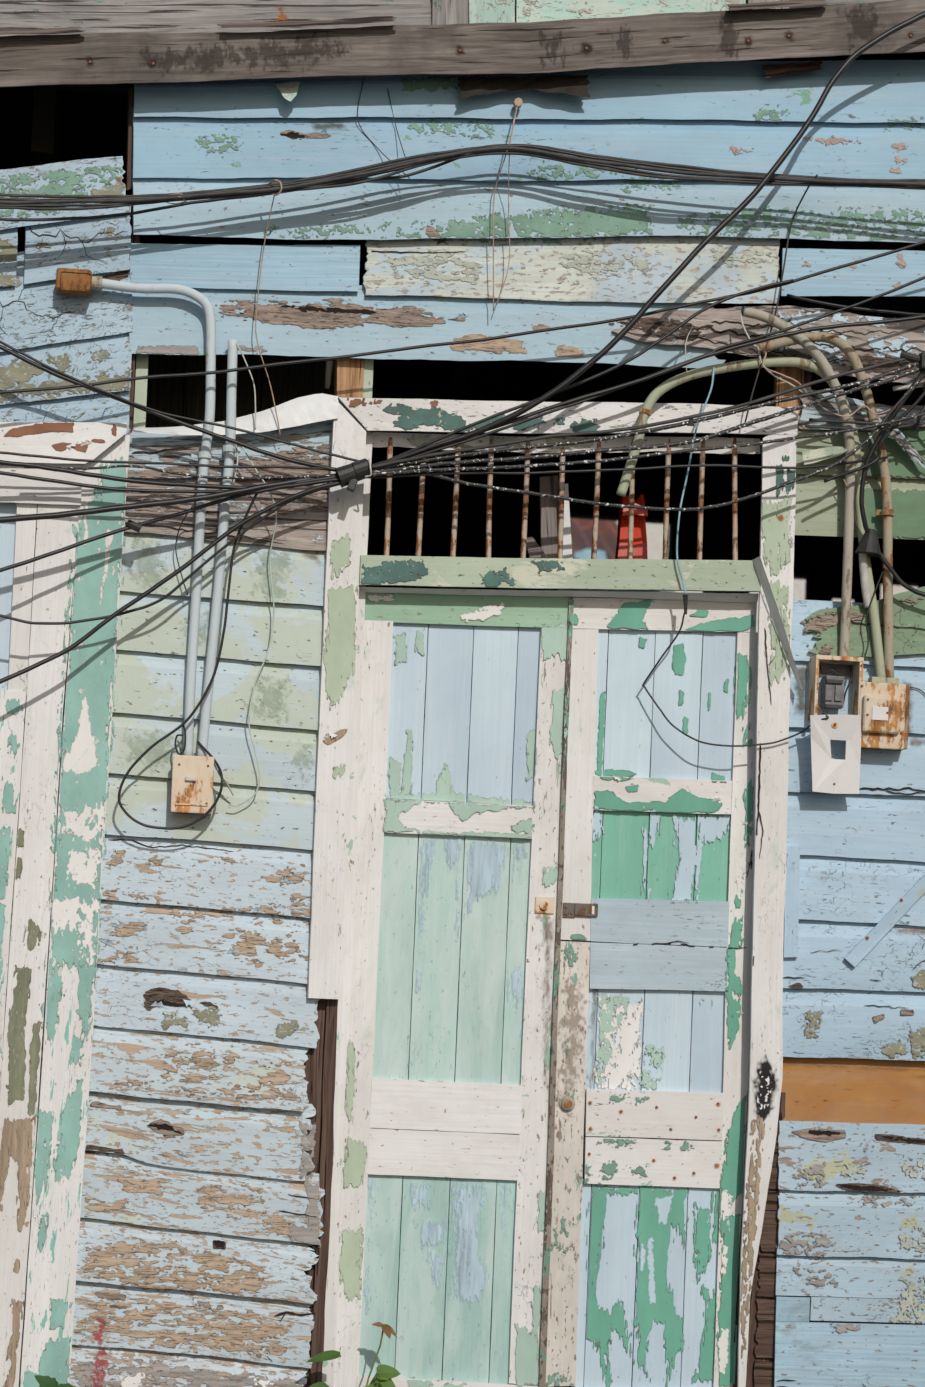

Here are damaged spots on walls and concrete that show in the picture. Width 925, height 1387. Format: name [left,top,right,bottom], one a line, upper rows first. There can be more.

peeling [0,163,125,289]
peeling [677,206,925,288]
peeling [136,345,199,355]
spalling [281,305,376,314]
peeling [4,422,117,452]
peeling [321,532,429,710]
peeling [460,567,515,625]
peeling [0,456,321,1253]
peeling [557,992,666,1105]
peeling [793,1136,925,1207]
peeling [580,1071,773,1387]
peeling [3,1235,302,1387]